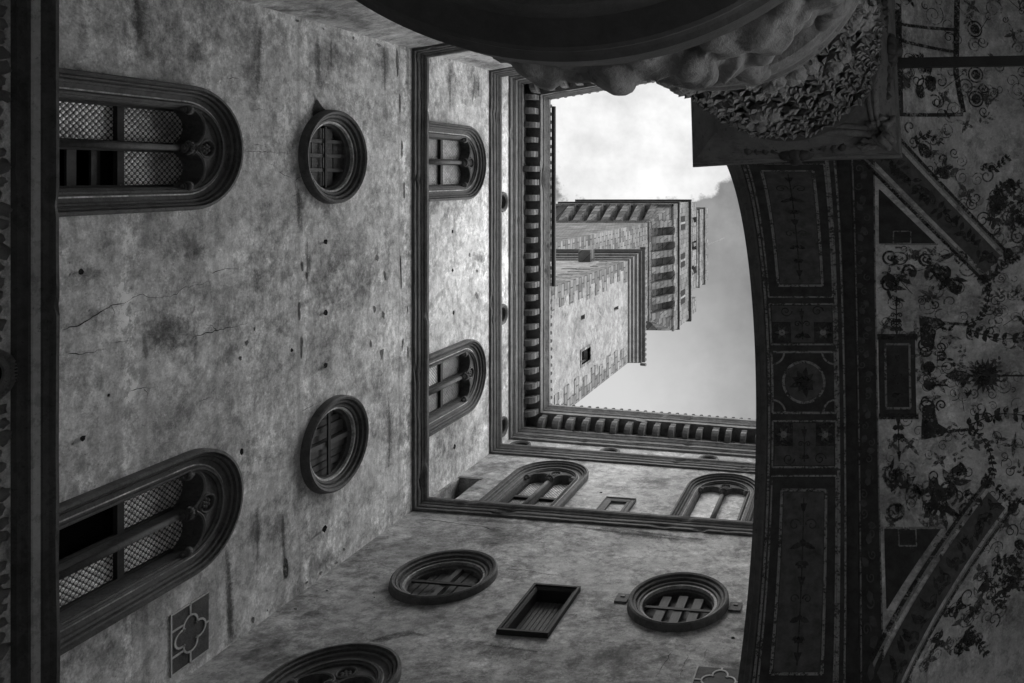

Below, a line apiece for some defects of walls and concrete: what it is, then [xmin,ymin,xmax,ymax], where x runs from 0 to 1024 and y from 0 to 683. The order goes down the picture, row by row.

crack [64,268,233,355]